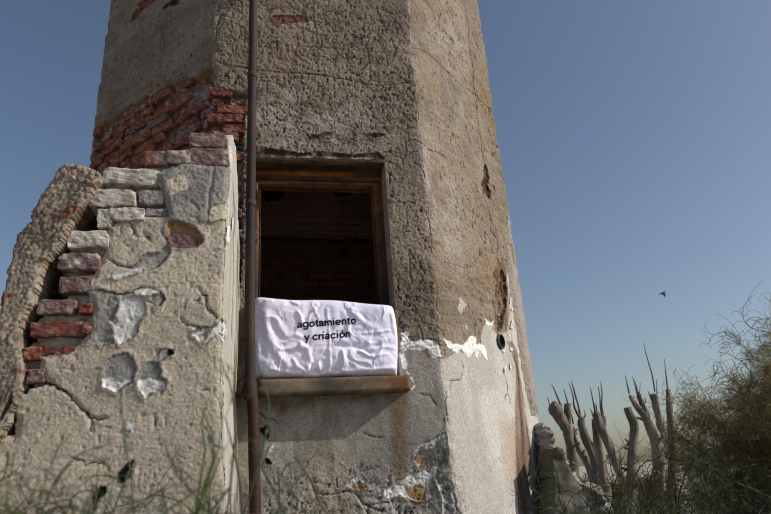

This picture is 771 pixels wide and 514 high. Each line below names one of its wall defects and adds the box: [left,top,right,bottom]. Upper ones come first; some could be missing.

spalling [131,0,155,22]
crack [264,16,492,161]
flaking render [90,78,248,261]
flaking render [256,147,384,160]
spalling [481,164,491,199]
flaking render [102,288,174,400]
crack [181,290,220,328]
flaking render [184,320,227,346]
spalling [495,270,514,352]
crack [45,383,106,432]
flaking render [384,433,462,514]